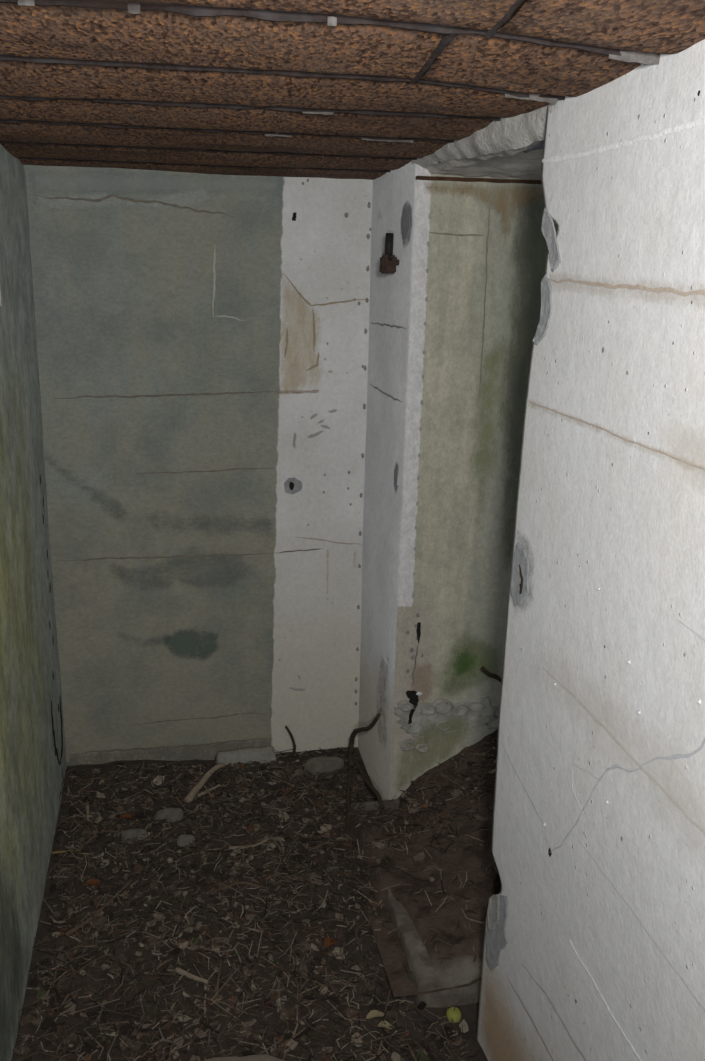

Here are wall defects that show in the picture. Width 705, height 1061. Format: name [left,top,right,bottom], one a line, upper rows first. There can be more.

spalling [523,140,544,153]
corrosion [529,401,705,469]
water stain [165,631,217,659]
crack [500,668,705,1012]